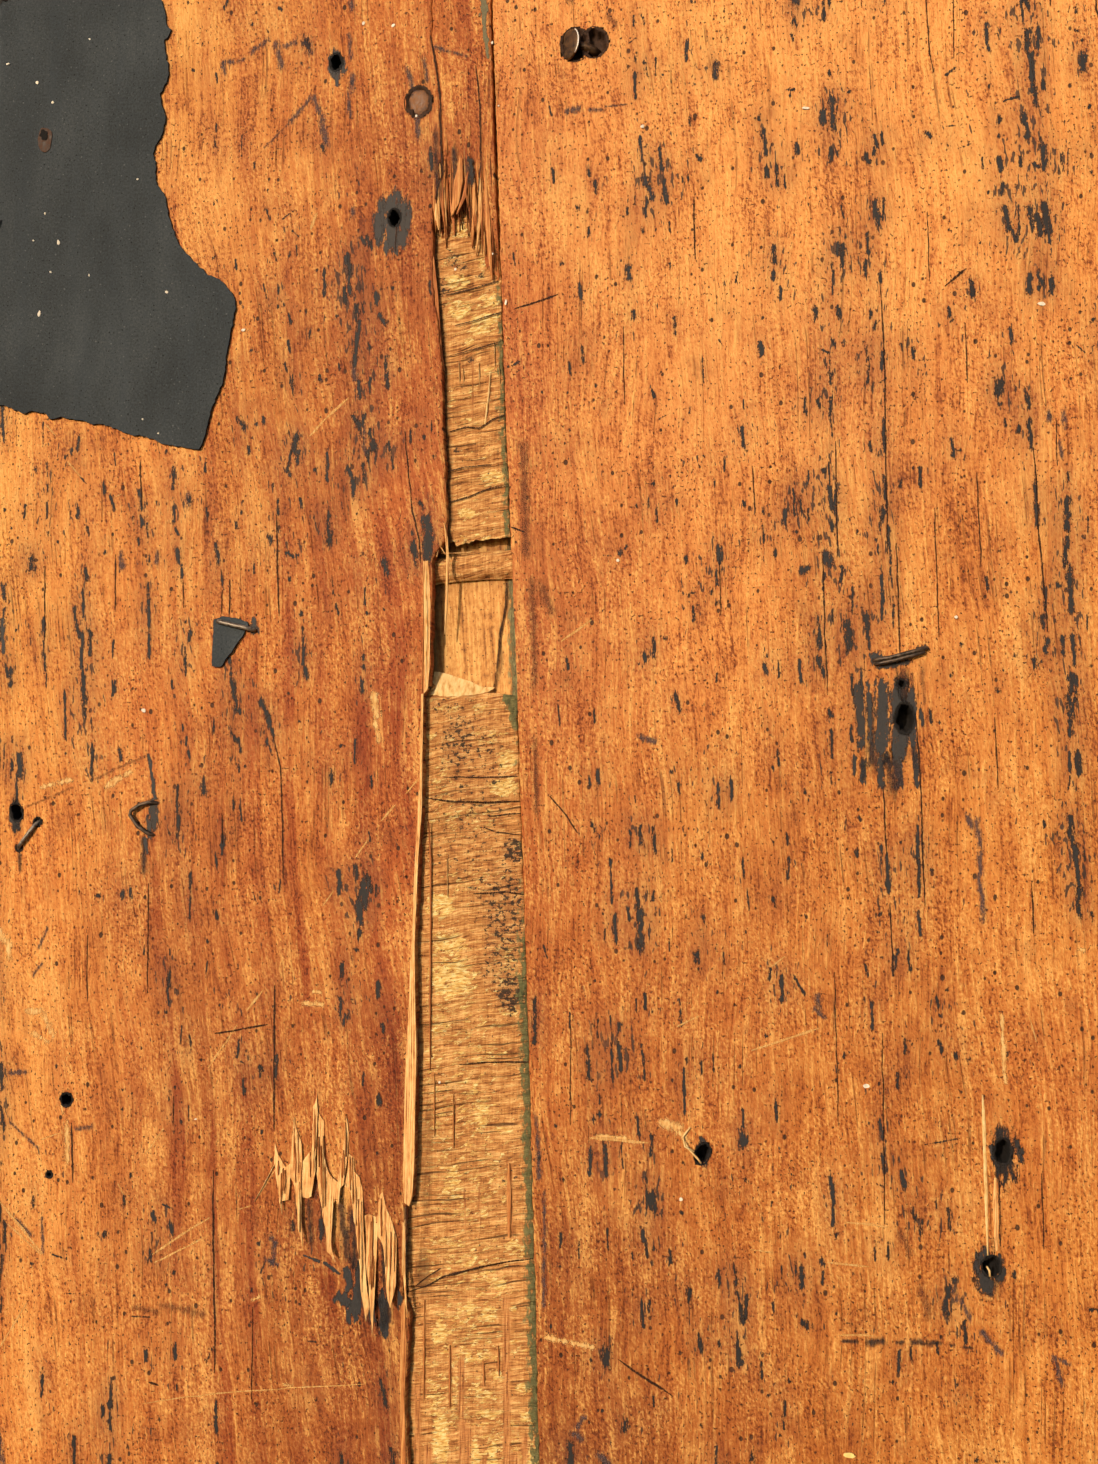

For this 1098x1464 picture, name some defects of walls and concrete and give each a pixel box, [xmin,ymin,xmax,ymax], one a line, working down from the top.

peeling [406,136,540,1464]